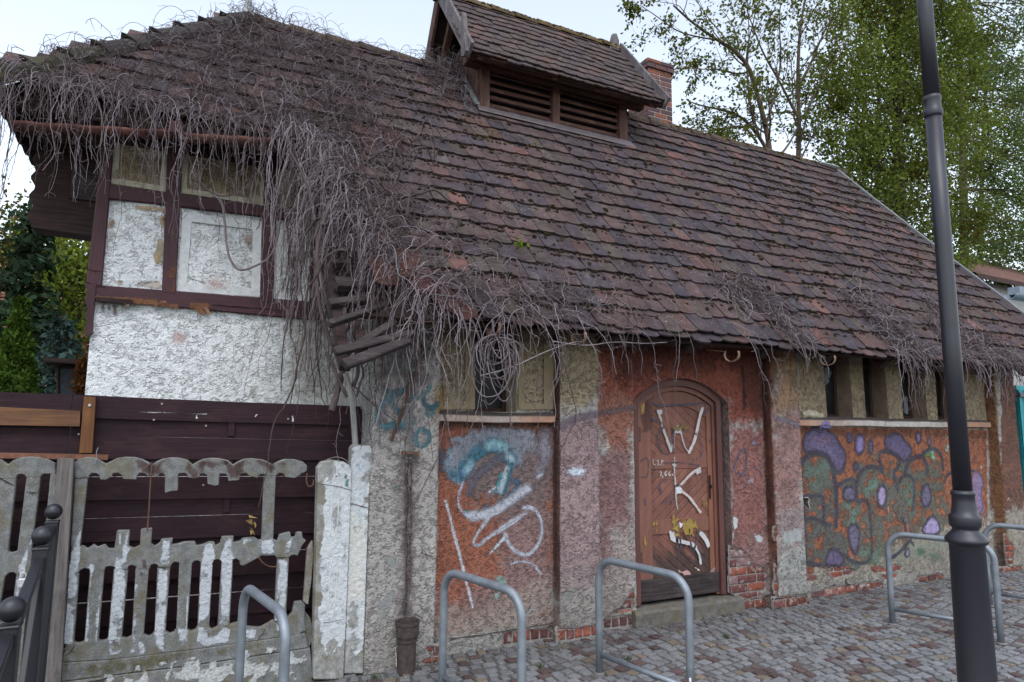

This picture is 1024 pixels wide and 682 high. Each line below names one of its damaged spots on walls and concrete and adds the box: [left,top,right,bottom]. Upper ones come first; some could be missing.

peeling [95,238,211,315]
peeling [64,530,292,655]
peeling [317,446,371,656]
flaking render [502,589,635,647]
flaking render [711,517,902,610]
flaking render [918,573,944,582]
flaking render [999,533,1022,573]